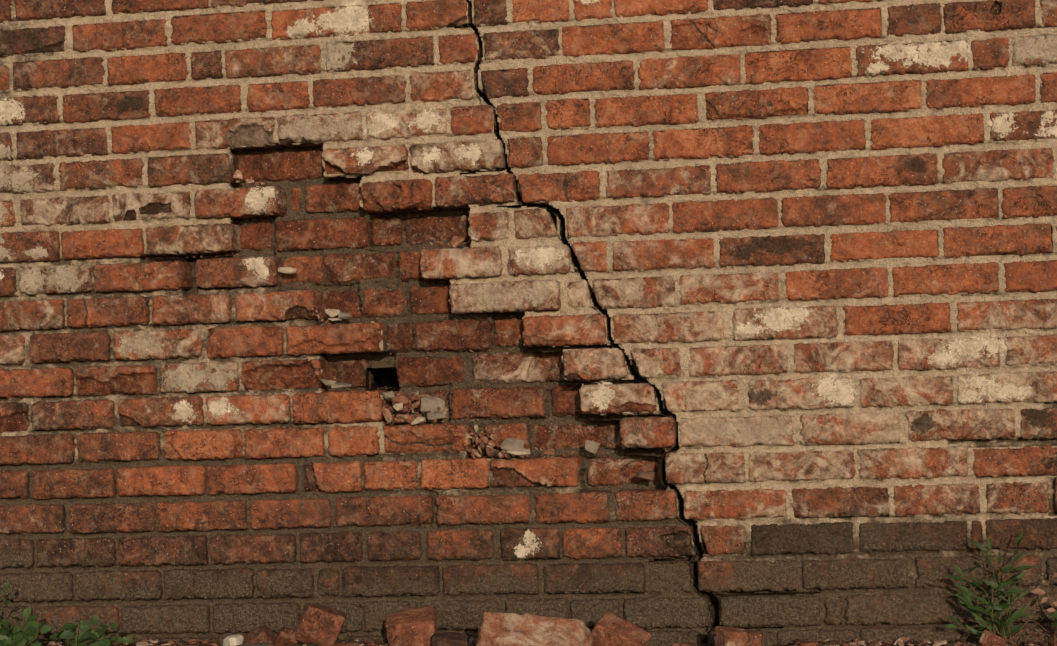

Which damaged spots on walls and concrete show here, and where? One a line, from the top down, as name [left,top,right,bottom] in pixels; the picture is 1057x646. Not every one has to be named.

spalling [223,122,669,493]
crack [452,0,820,642]